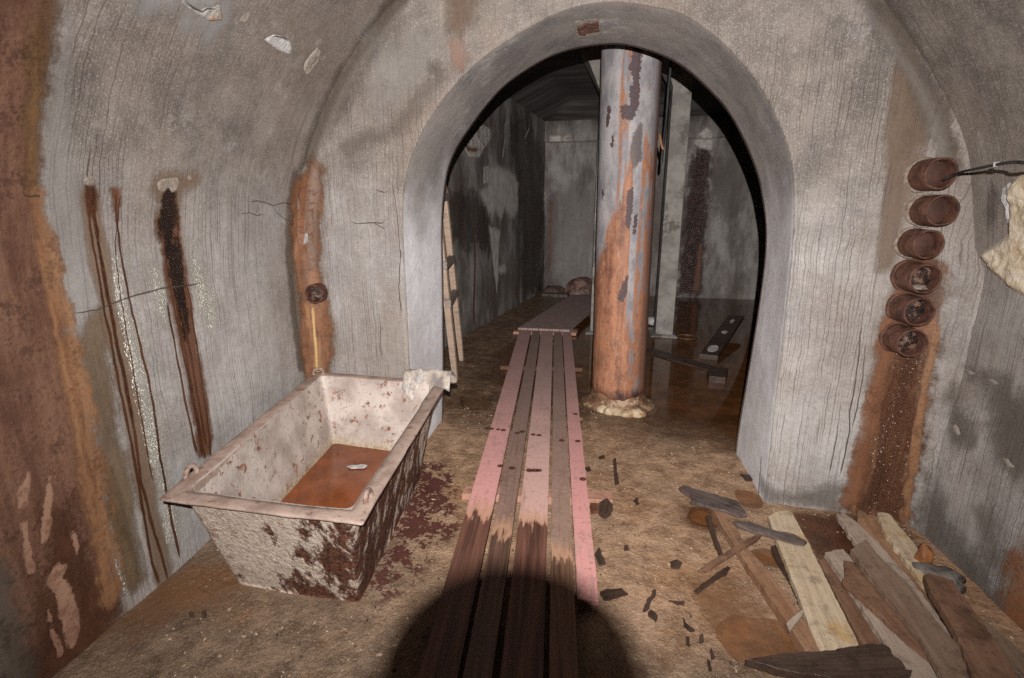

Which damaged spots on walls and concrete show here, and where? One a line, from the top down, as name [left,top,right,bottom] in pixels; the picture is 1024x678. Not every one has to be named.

spalling [182,0,222,21]
spalling [265,35,292,54]
flaking render [304,48,321,75]
rust [0,0,129,678]
rust [81,186,180,585]
rust [154,189,213,458]
rust [290,157,334,379]
damp [449,120,557,295]
rust [793,258,948,564]